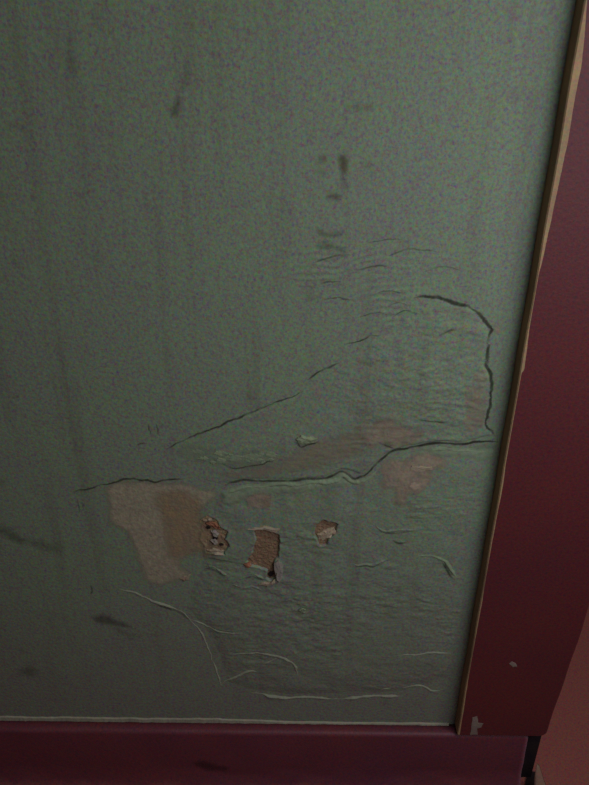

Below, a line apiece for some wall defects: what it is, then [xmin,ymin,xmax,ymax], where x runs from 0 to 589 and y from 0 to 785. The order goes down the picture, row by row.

crack [223,295,494,504]
crack [82,478,176,490]
peeling [107,482,229,584]
spalling [244,526,283,587]
spalling [315,520,337,545]